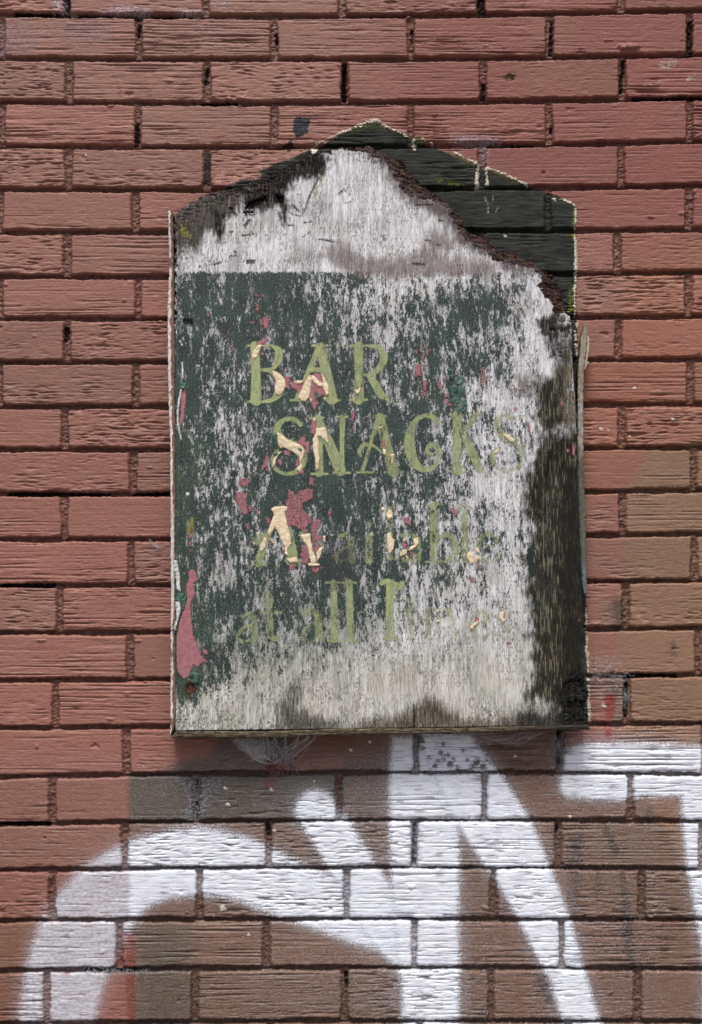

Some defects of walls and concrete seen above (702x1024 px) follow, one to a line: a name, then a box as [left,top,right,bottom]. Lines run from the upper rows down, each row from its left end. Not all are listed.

peeling [227,117,578,402]